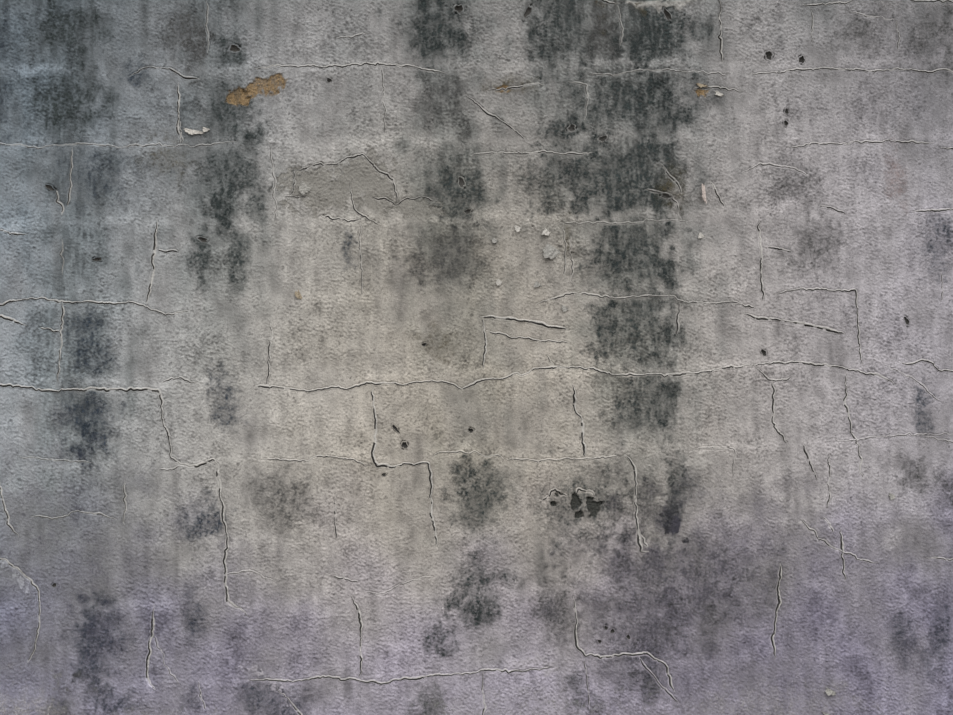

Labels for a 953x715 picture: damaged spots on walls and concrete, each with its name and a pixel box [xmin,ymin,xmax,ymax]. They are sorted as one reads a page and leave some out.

spalling [227,74,285,106]
damp [521,74,698,214]
damp [529,0,712,68]
crack [568,0,953,121]
damp [197,150,264,283]
peeling [542,228,560,259]
crack [0,218,275,617]
crack [252,220,953,582]
spalling [541,487,602,518]
crack [246,575,556,715]
damp [427,569,506,657]
crack [572,596,679,710]